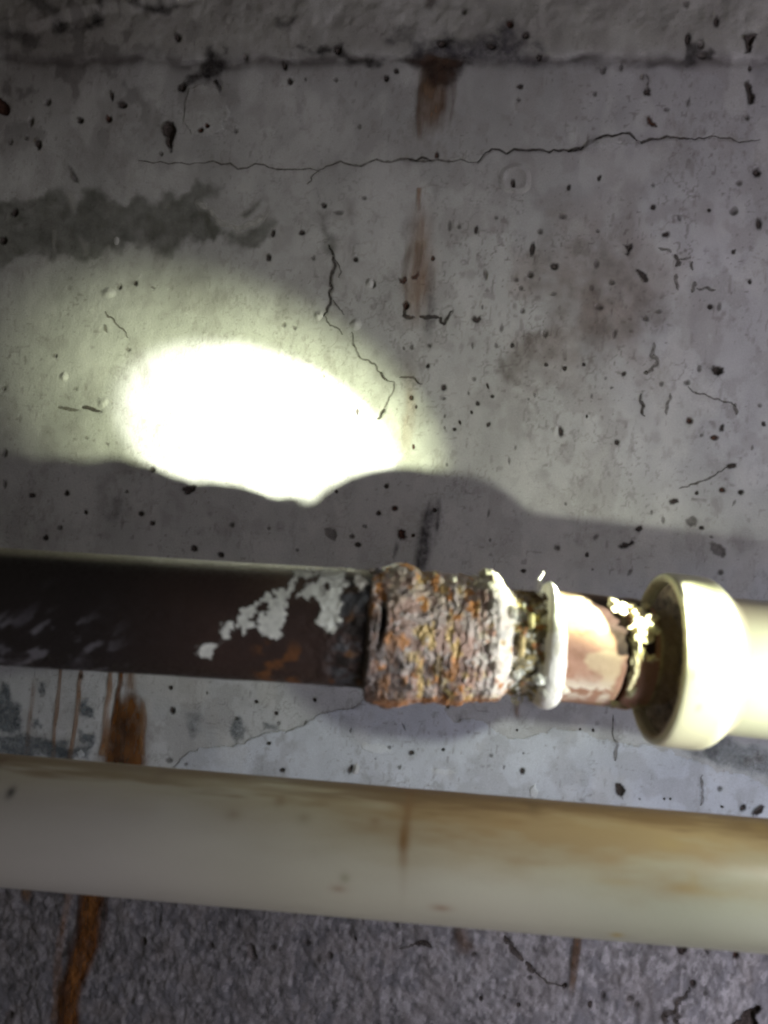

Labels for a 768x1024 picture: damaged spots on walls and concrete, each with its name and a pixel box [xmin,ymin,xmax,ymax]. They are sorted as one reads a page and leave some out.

rust [409,55,464,123]
crack [138,132,759,184]
leakage [0,188,265,261]
crack [323,246,421,420]
rust [100,673,145,765]
rust [58,895,108,1024]